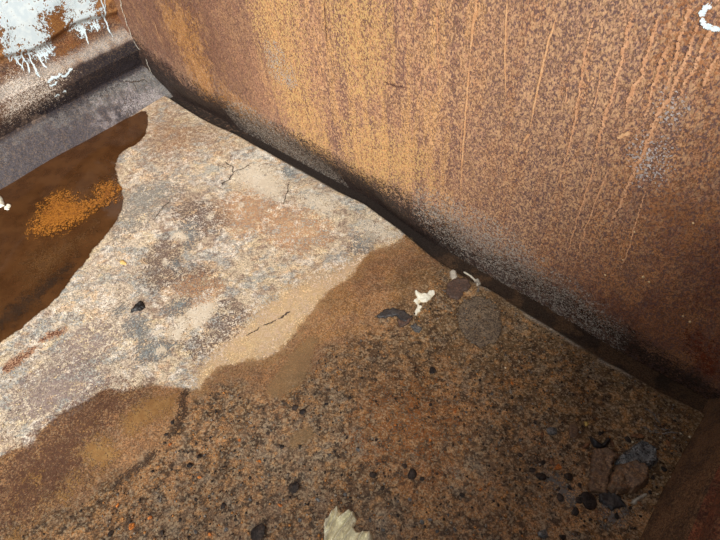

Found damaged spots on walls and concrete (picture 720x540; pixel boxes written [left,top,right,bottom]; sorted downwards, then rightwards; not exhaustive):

rust [26,0,439,239]
water stain [35,34,720,400]
rust [460,65,470,197]
rust [523,16,557,142]
rust [550,8,597,204]
rust [565,12,635,271]
rust [604,0,720,240]
water stain [0,377,147,538]